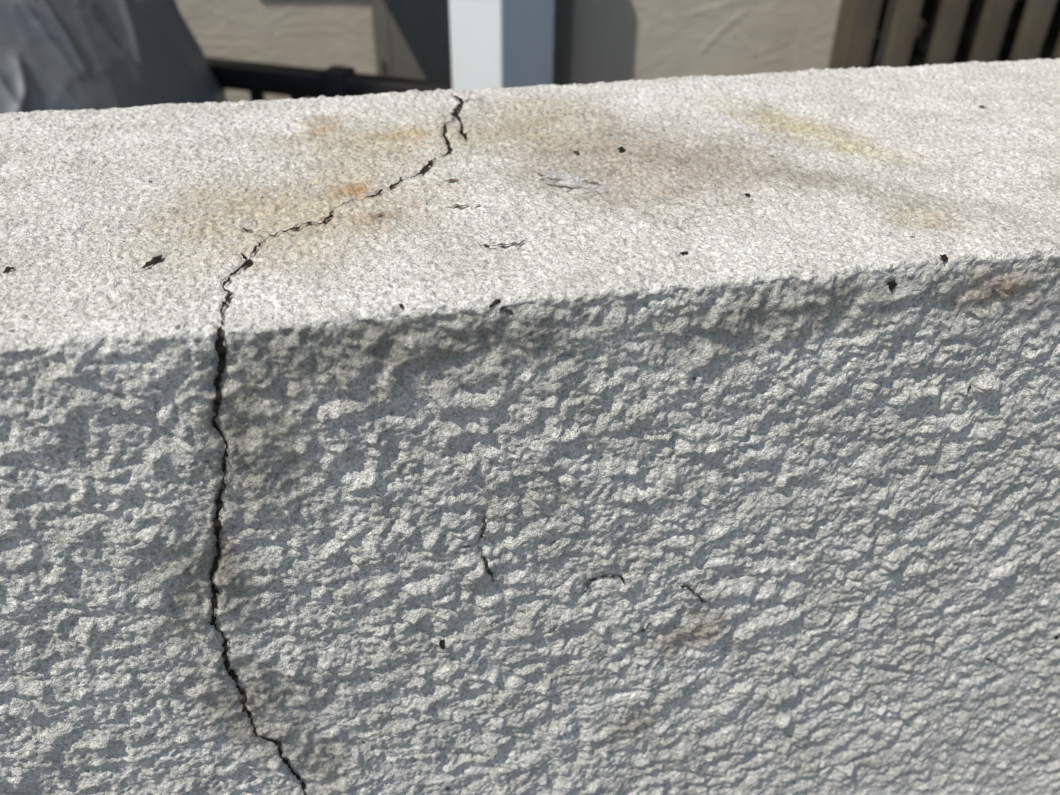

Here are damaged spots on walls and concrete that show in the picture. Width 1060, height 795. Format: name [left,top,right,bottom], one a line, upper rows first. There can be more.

crack [478,239,529,247]
crack [209,93,484,795]
crack [463,514,494,587]